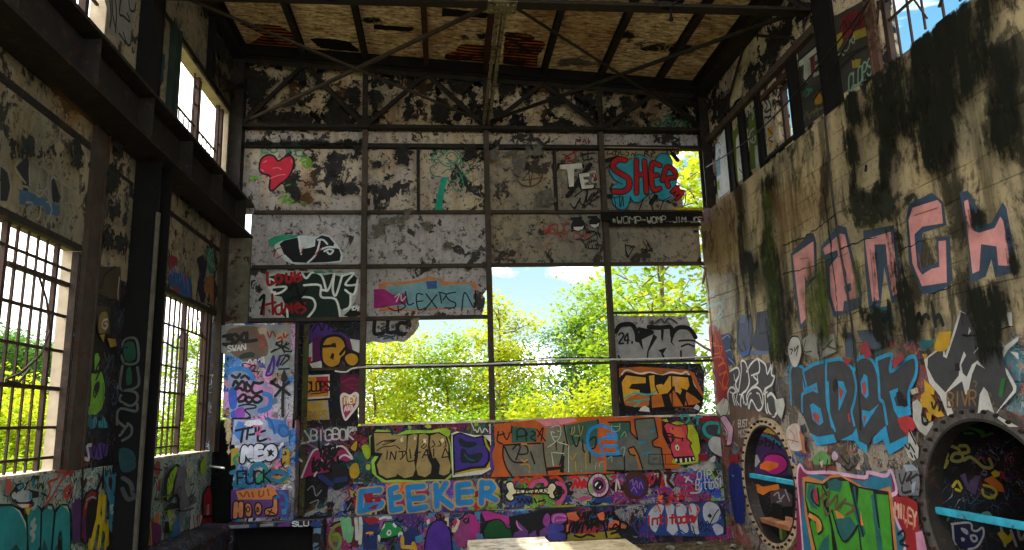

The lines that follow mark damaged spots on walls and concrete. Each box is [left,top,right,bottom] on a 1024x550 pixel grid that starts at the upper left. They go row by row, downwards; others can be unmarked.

peeling [430,80,700,140]
peeling [283,170,302,203]
peeling [308,147,346,195]
peeling [352,142,415,182]
peeling [462,146,484,163]
leakage [803,0,1021,366]
leakage [735,145,786,365]